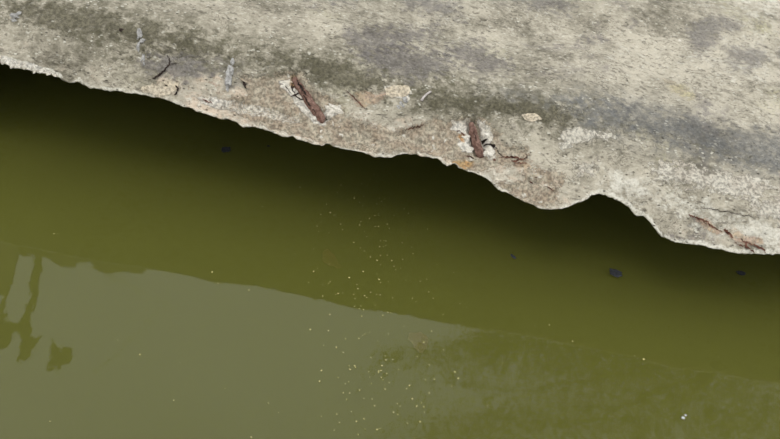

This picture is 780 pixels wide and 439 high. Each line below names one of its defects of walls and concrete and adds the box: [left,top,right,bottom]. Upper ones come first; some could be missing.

spalling [0,55,56,77]
spalling [140,79,179,97]
spalling [192,70,566,209]
spalling [558,126,617,150]